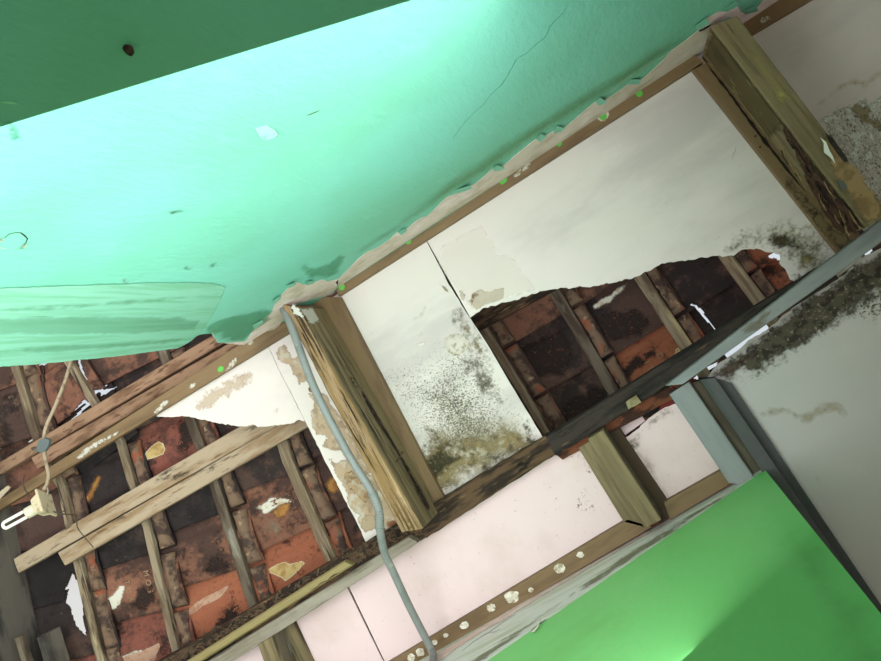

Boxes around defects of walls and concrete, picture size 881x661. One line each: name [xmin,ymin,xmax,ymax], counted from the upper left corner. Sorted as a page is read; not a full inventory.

crack [453,8,566,138]
peeling [226,0,778,345]
crack [431,250,467,313]
water stain [770,227,825,278]
water stain [714,253,881,379]
water stain [387,315,534,489]
peeling [427,530,651,661]